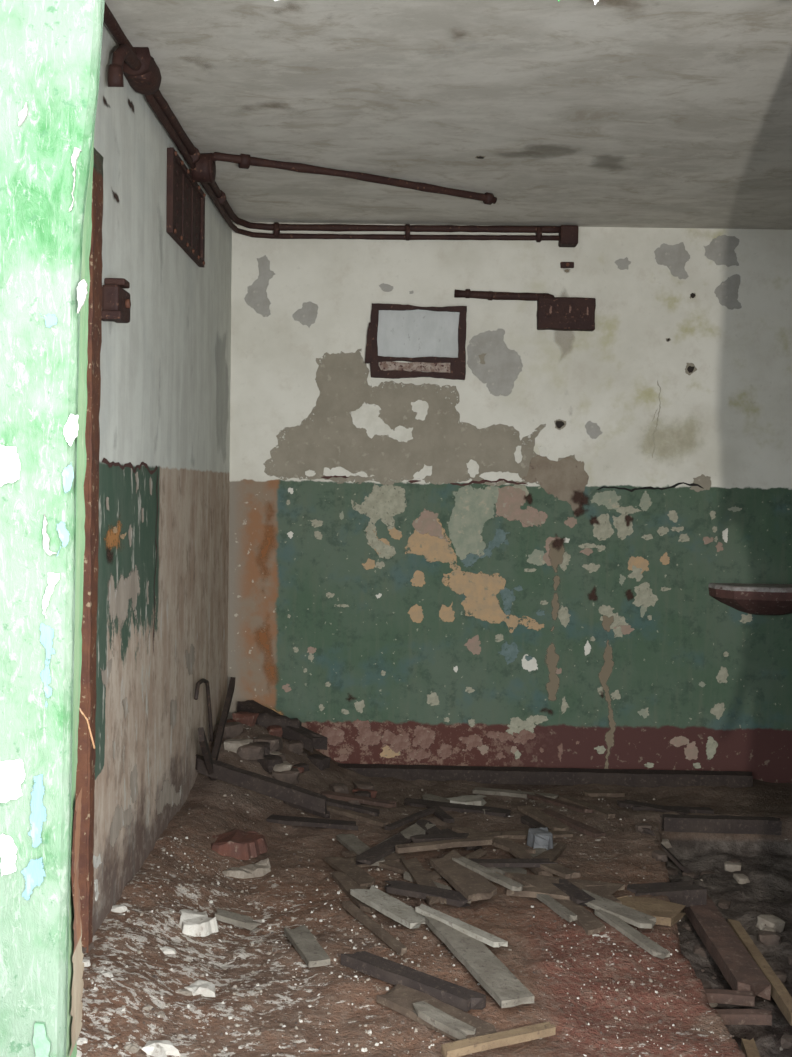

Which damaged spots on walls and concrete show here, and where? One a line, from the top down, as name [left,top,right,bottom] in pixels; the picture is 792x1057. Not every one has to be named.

peeling [77,279,88,313]
spalling [654,242,690,279]
spalling [704,235,742,310]
spalling [467,328,523,396]
peeling [64,414,79,446]
peeling [62,463,74,494]
spalling [264,349,690,673]
peeling [100,565,149,687]
peeling [315,700,548,762]
peeling [670,736,718,769]
peeling [0,759,47,901]
peeling [69,788,84,1057]